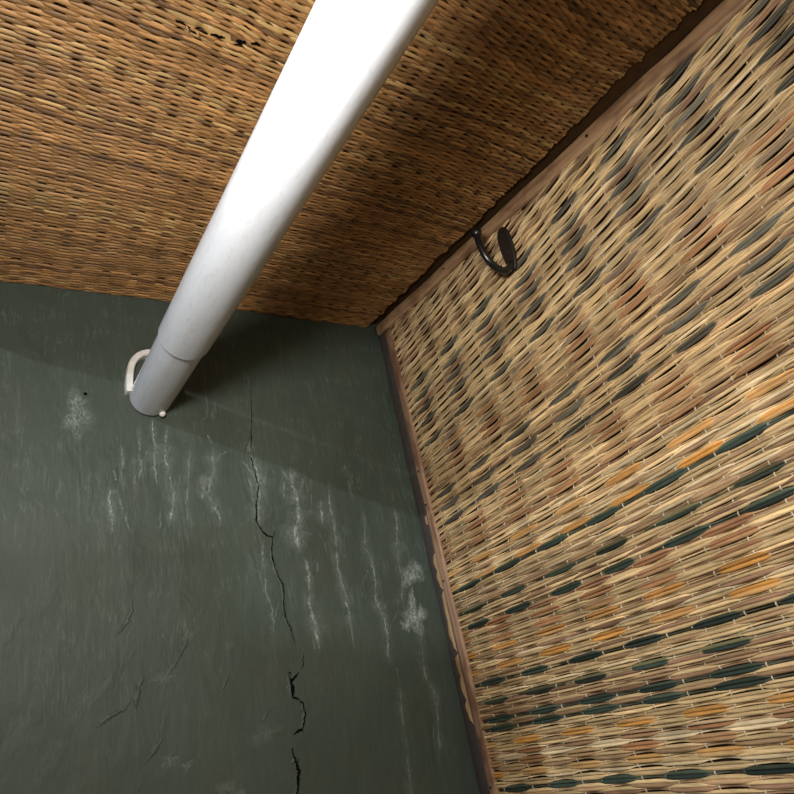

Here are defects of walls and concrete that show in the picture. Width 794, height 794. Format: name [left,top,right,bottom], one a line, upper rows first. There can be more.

crack [245,381,307,794]